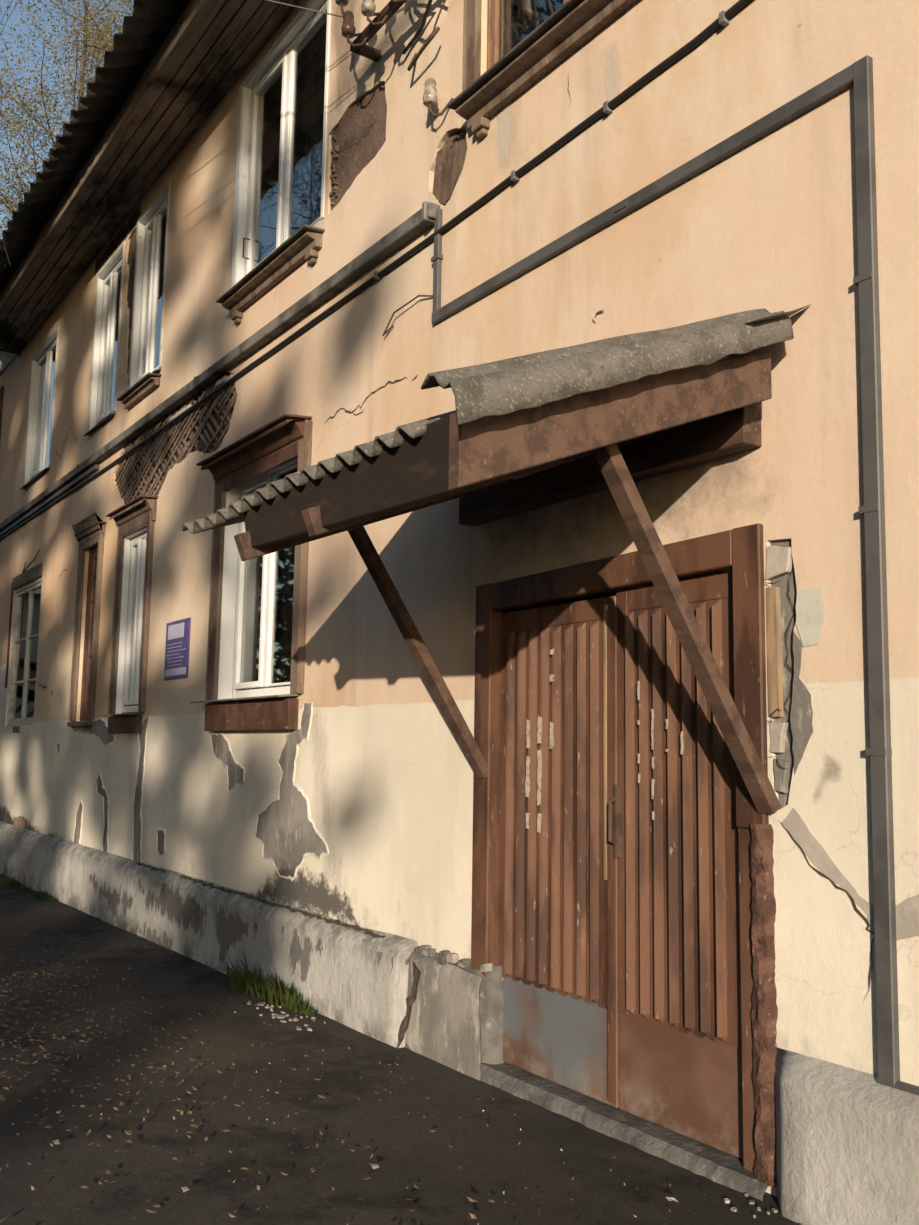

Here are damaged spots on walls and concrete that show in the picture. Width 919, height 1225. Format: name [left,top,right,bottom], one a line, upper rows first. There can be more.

crack [325,375,418,422]
flaking render [762,539,813,810]
peeling [73,799,84,844]
peeling [71,717,116,747]
peeling [96,770,110,853]
peeling [132,715,166,862]
peeling [210,732,245,793]
peeling [253,701,330,882]
peeling [87,869,258,963]